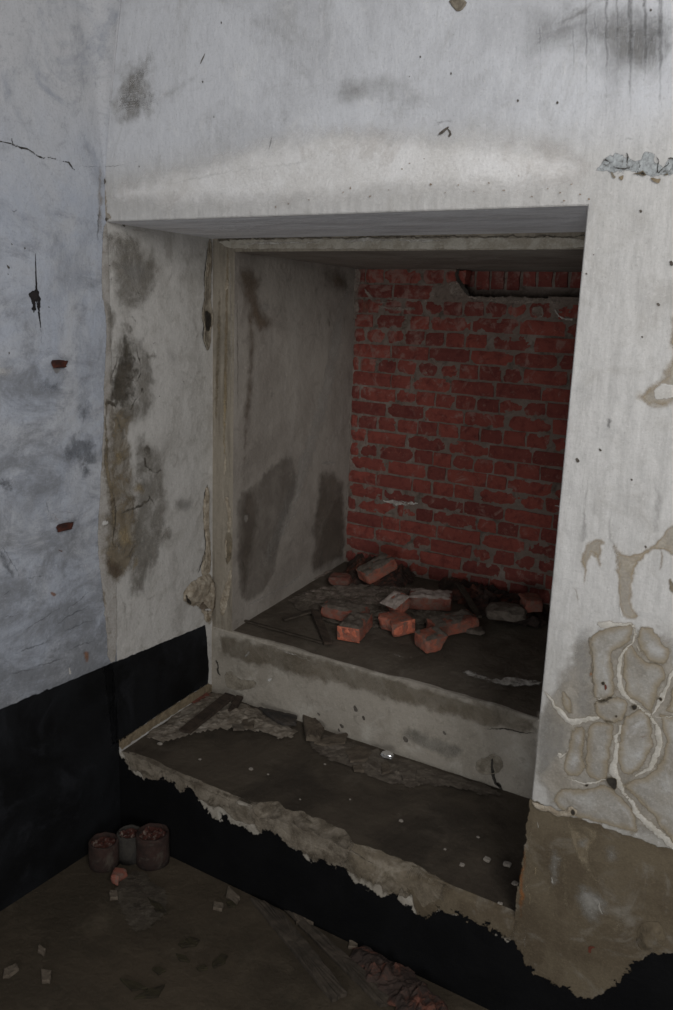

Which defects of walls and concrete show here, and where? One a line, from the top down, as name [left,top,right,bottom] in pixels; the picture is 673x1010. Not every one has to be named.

crack [0,138,74,169]
peeling [597,152,673,183]
water stain [108,238,153,305]
water stain [68,337,169,589]
water stain [313,476,344,570]
peeling [117,621,673,1000]